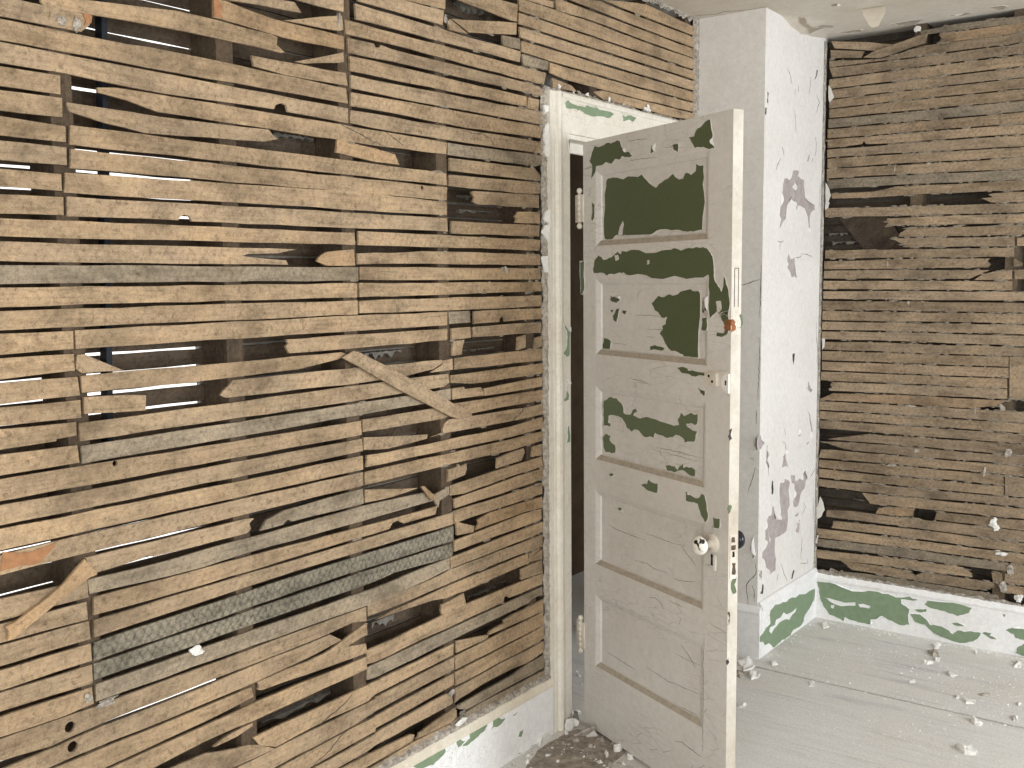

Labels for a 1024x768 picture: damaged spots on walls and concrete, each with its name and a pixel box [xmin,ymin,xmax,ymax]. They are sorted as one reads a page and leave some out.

peeling [564,100,637,123]
peeling [590,139,632,179]
peeling [672,119,715,154]
peeling [779,154,831,232]
peeling [579,163,743,397]
peeling [602,397,699,454]
peeling [641,479,658,493]
peeling [685,491,732,530]
peeling [750,435,807,594]
peeling [817,497,825,519]
peeling [759,581,1024,668]
peeling [406,711,518,768]